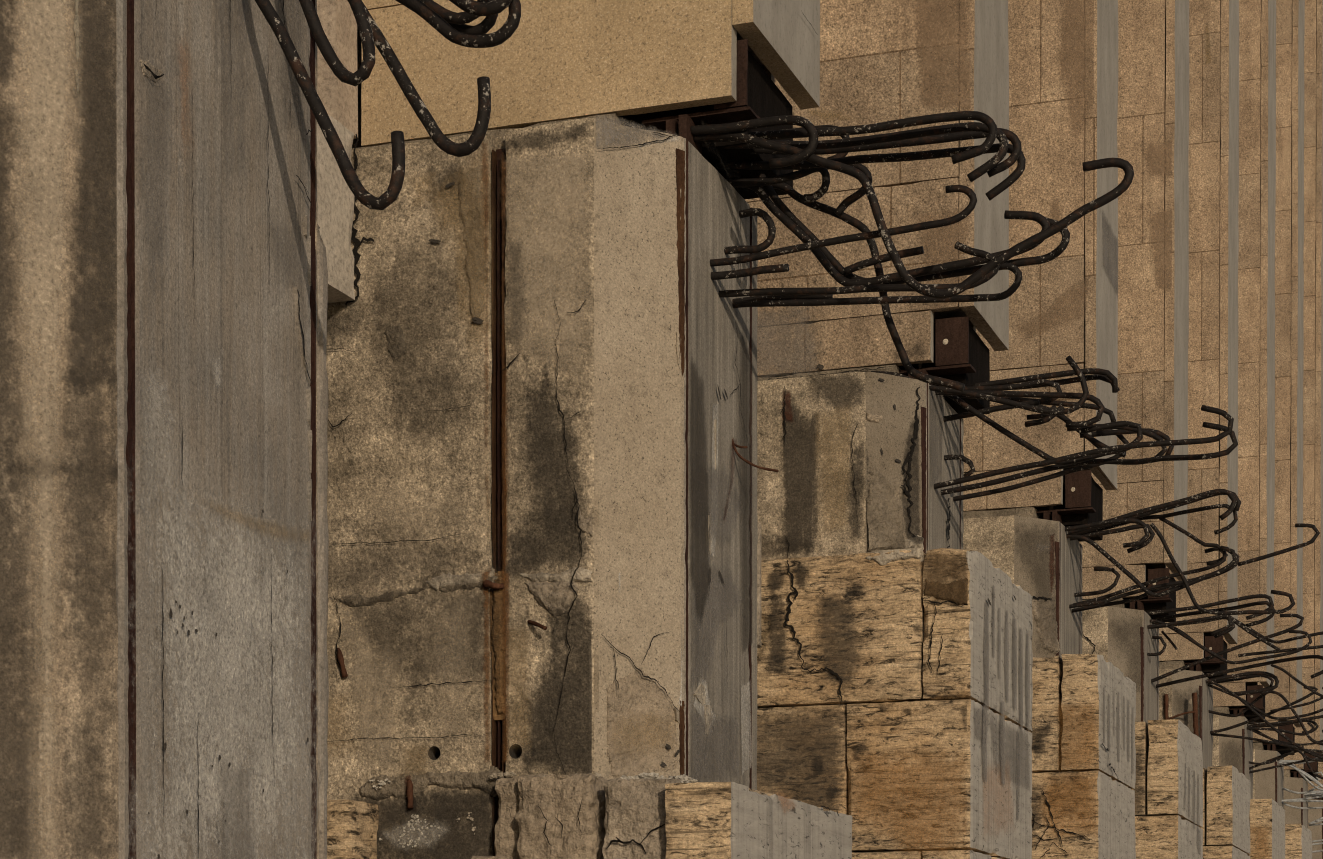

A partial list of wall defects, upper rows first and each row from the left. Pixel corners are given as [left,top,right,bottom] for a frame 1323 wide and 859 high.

crack [345,134,374,305]
leakage [0,0,118,859]
leakage [508,375,581,574]
crack [901,387,951,548]
corrosion [483,571,509,761]
leakage [524,599,592,775]
crack [538,299,665,854]
crack [601,632,679,711]
crack [784,540,843,704]
leakage [818,583,863,683]
crack [921,598,967,675]